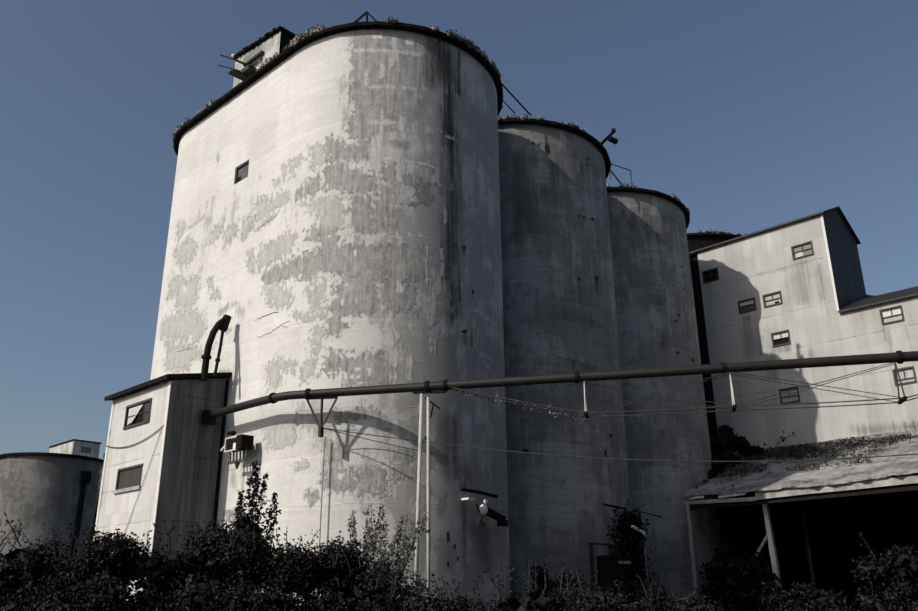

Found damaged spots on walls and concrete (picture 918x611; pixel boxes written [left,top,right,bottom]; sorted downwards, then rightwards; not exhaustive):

peeling [115,29,456,401]
water stain [334,35,496,357]